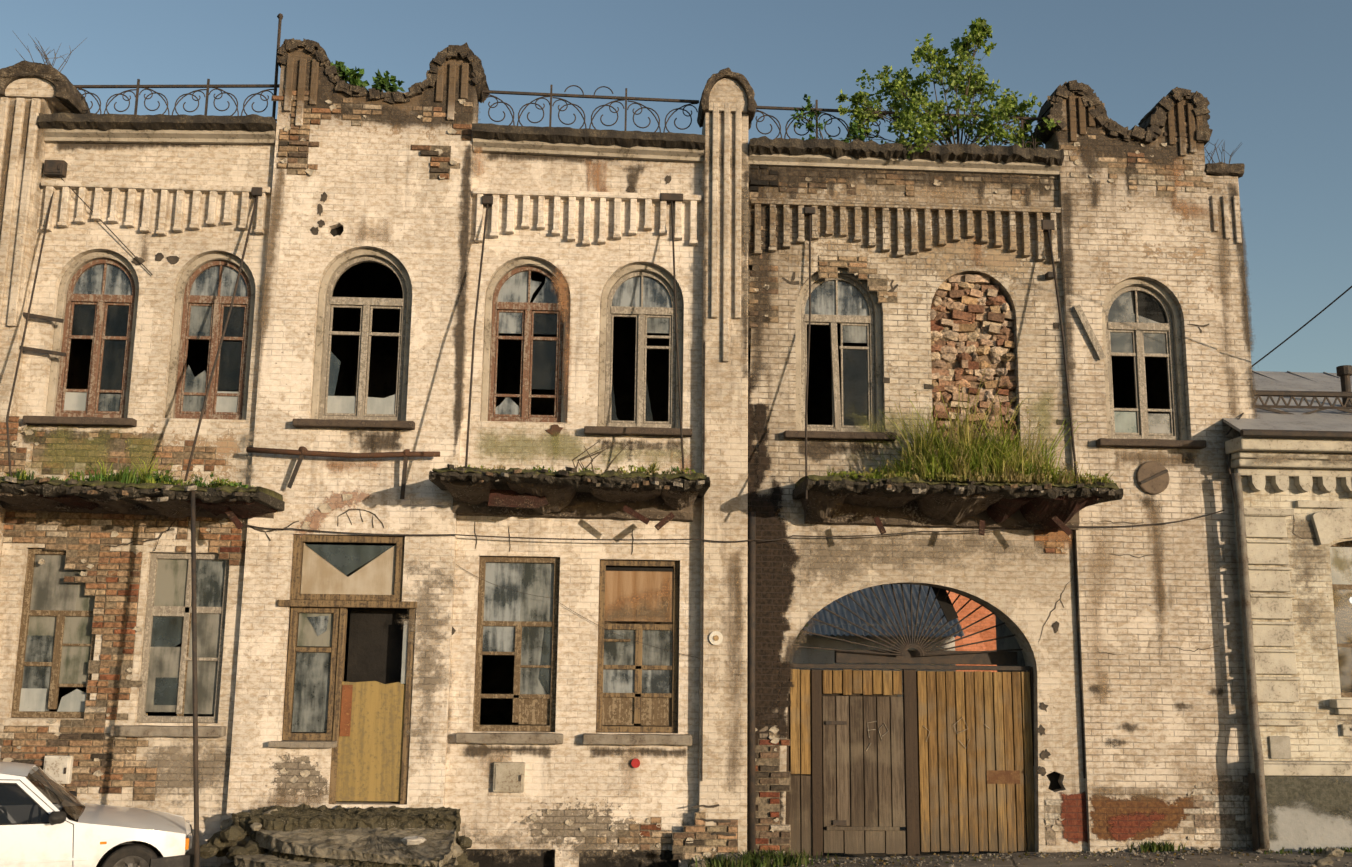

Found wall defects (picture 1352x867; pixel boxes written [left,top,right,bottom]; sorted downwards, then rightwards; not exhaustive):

spalling [271,85,393,176]
spalling [410,99,473,180]
spalling [748,96,1213,328]
damp [753,403,784,513]
spalling [0,416,253,801]
damp [775,617,814,739]
spalling [565,688,791,865]